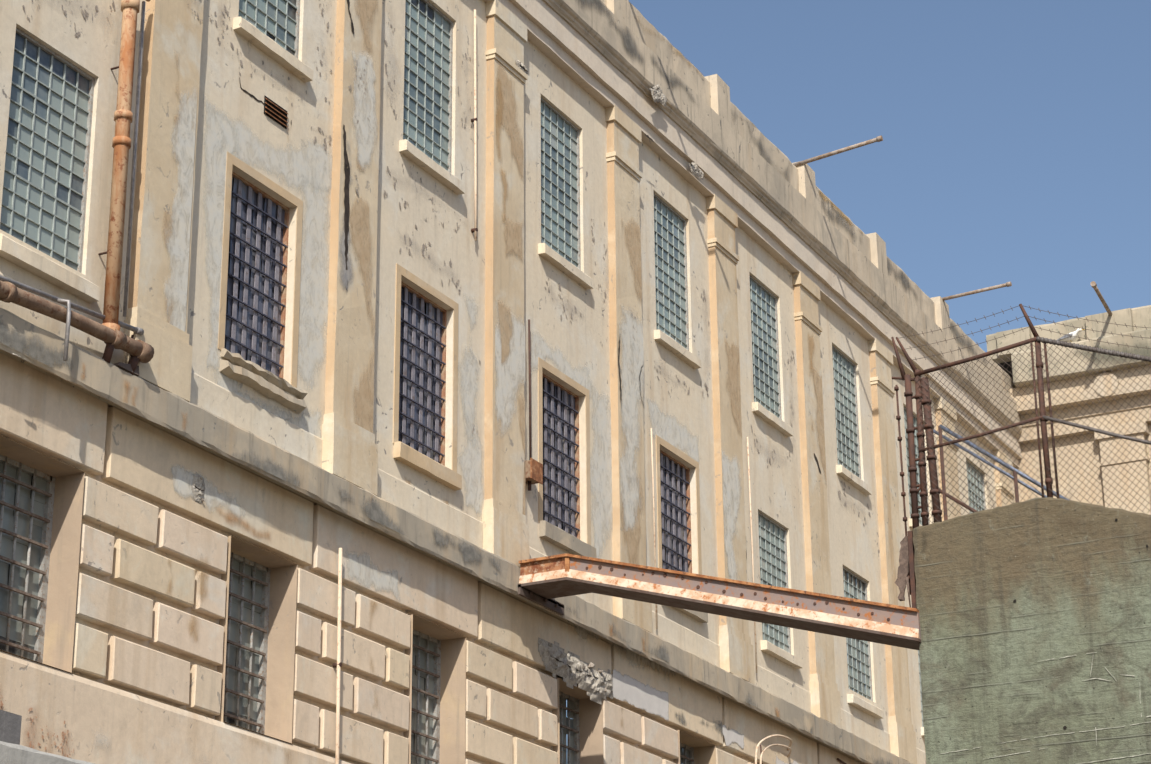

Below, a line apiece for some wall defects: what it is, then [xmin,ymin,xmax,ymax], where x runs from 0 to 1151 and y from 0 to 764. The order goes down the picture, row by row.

crack [346,0,354,34]
crack [342,124,350,290]
peeling [165,93,352,439]
spalling [538,637,613,705]
peeling [620,646,671,675]